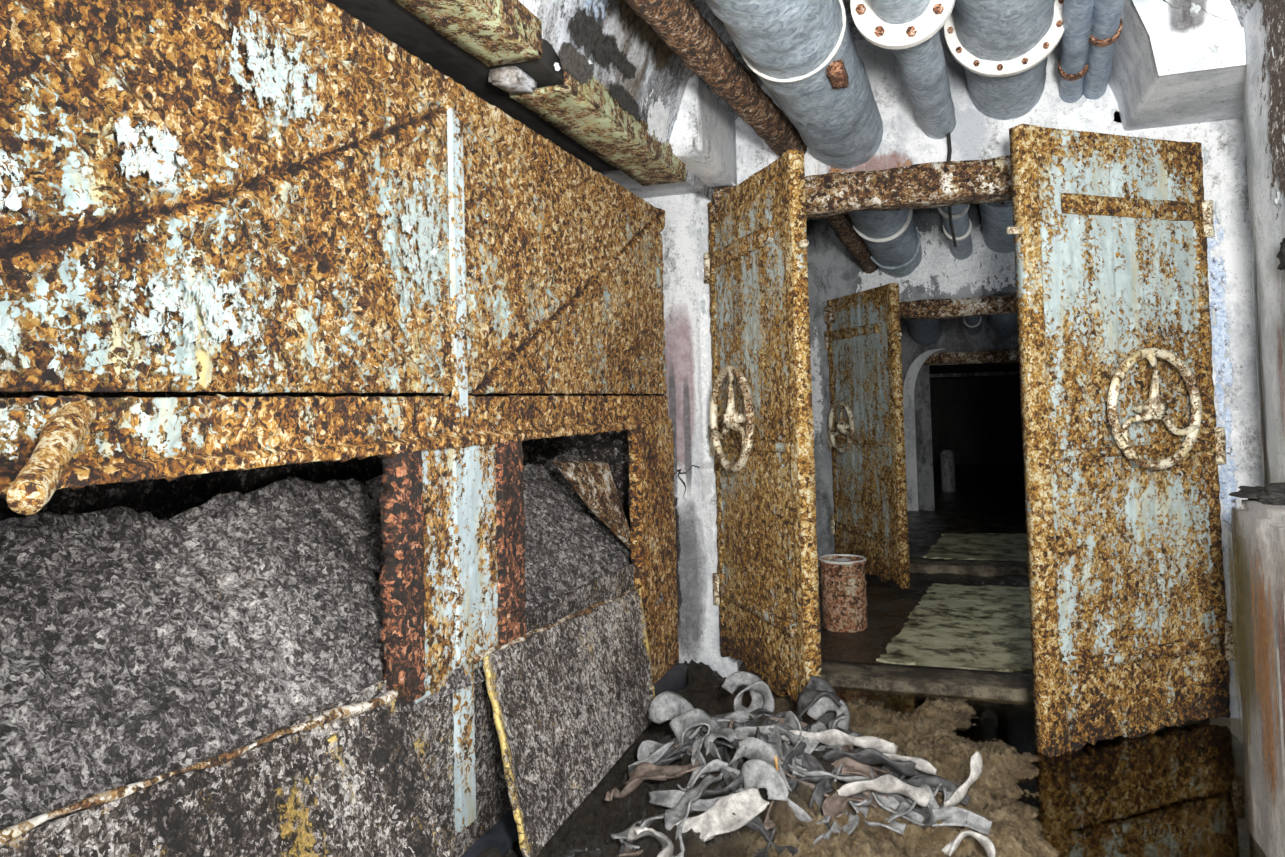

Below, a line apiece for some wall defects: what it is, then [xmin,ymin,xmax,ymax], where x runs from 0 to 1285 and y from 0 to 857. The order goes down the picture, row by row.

rust [830,153,912,173]
water stain [1229,518,1256,758]
water stain [1277,647,1285,806]